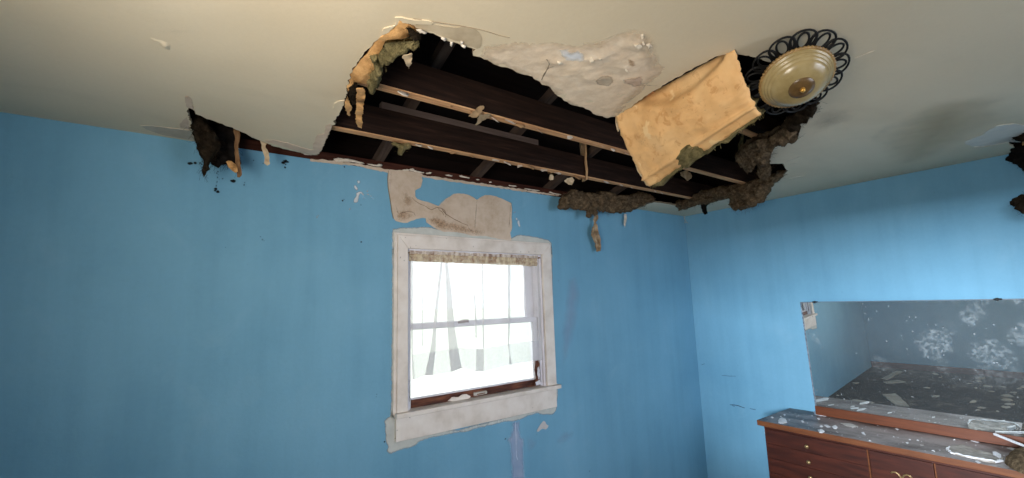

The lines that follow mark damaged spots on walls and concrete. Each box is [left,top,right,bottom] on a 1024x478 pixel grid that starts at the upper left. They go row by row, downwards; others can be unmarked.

peeling [382,17,433,35]
peeling [304,154,561,240]